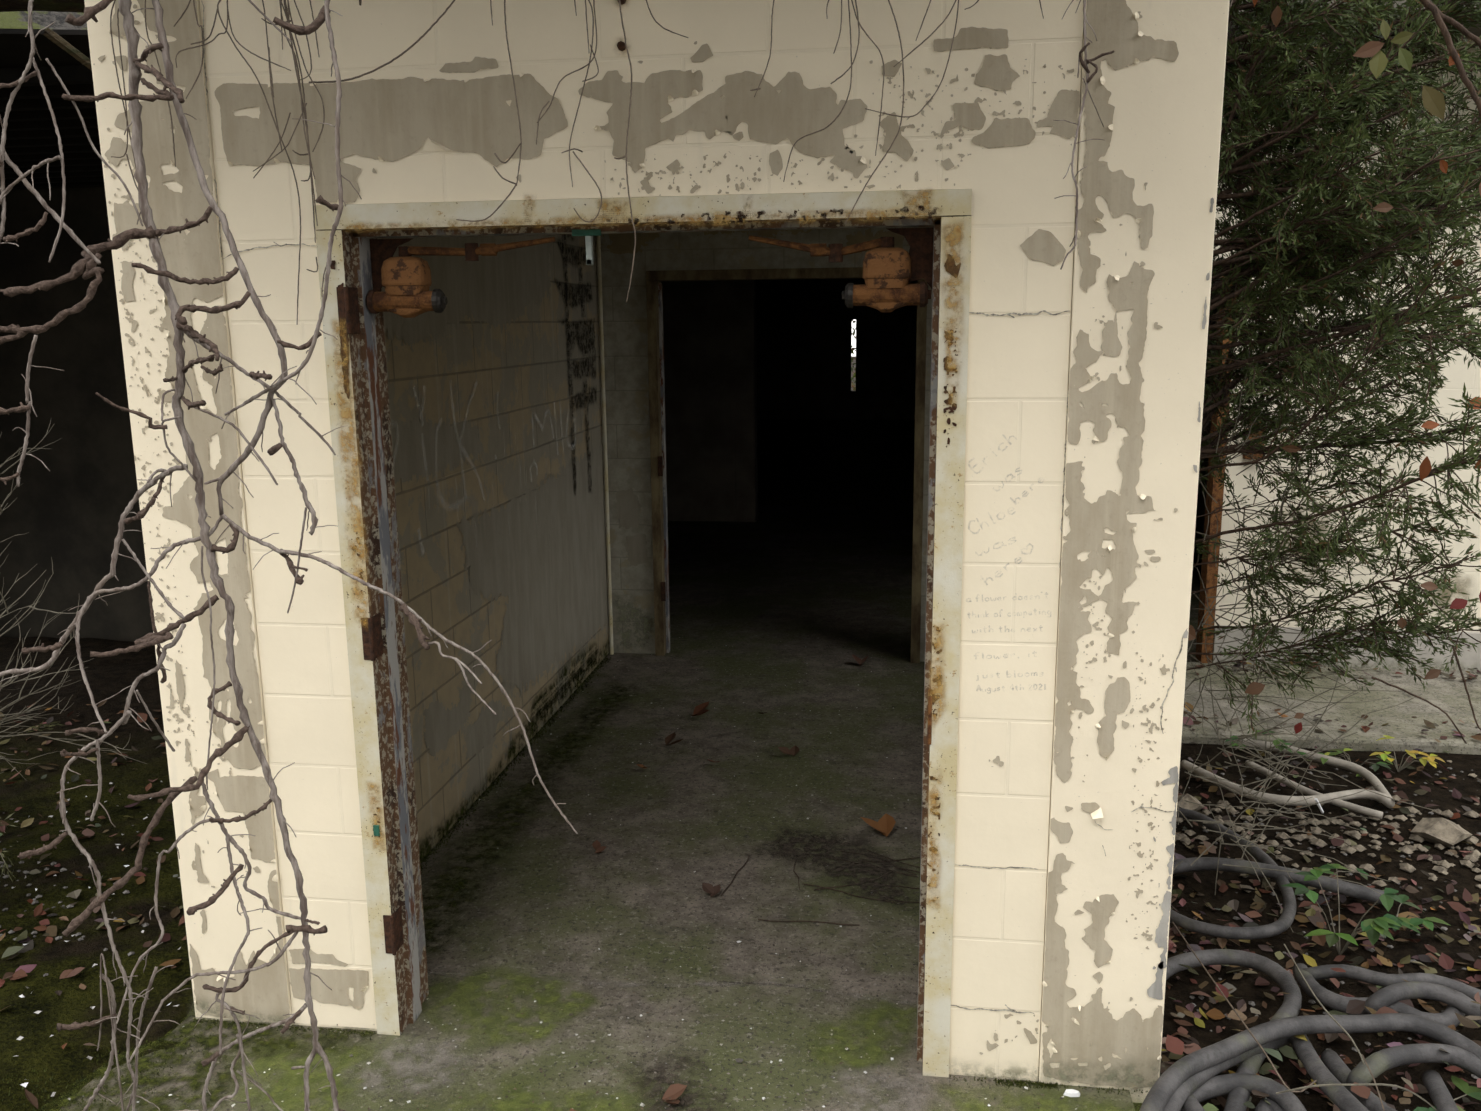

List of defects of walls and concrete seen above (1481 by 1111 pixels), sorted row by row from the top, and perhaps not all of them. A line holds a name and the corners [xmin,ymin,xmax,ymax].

corrosion [450,191,962,448]
corrosion [334,322,367,625]
corrosion [930,626,944,721]
corrosion [369,784,383,846]
corrosion [926,776,940,905]